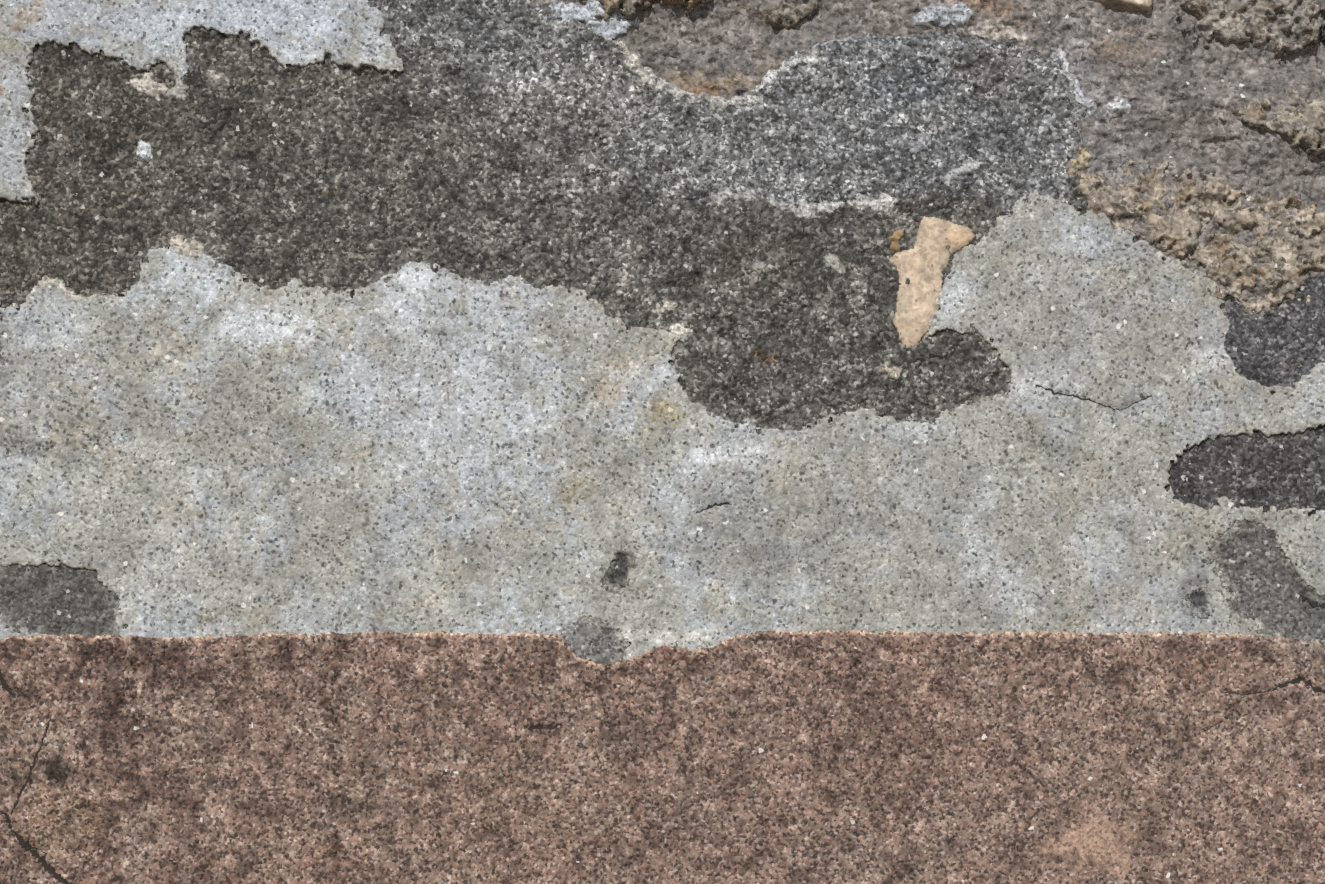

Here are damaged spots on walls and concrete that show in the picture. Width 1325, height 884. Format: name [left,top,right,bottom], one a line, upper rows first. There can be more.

spalling [0,0,1325,434]
spalling [0,560,127,636]
spalling [1165,425,1325,653]
crack [0,669,69,884]